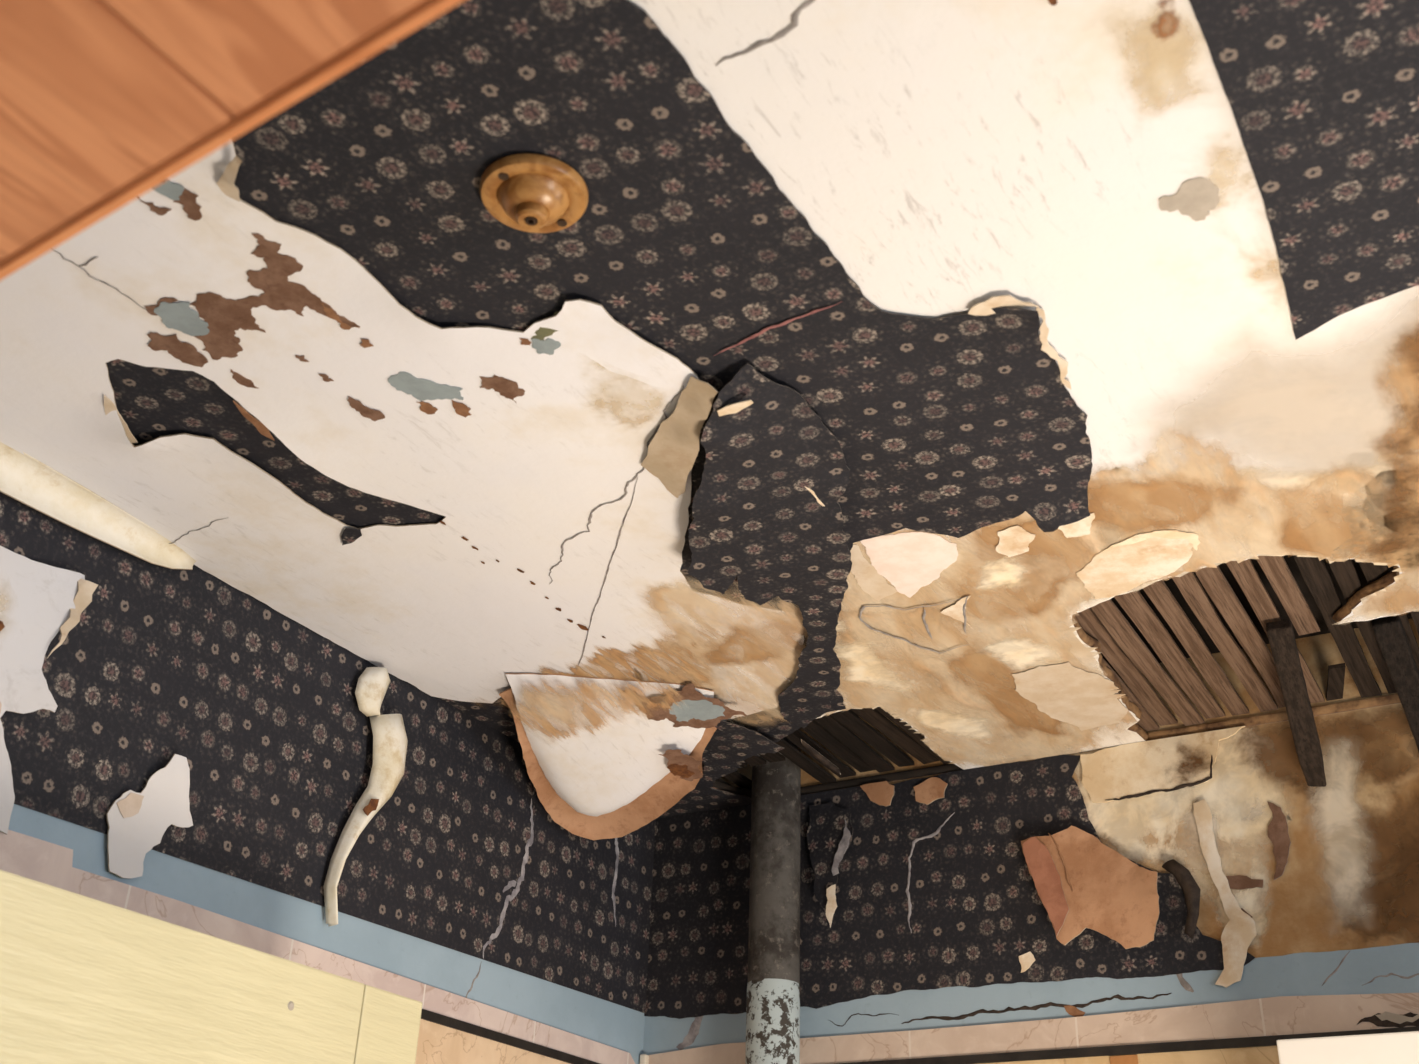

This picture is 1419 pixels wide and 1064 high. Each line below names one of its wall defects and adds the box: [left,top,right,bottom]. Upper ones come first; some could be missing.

crack [715,0,815,66]
crack [52,249,153,315]
peeling [145,233,374,389]
peeling [388,372,471,417]
peeling [479,375,525,402]
crack [549,386,684,666]
peeling [850,532,958,601]
peeling [1076,530,1200,599]
damp [827,301,1419,944]
peeling [323,667,408,927]
crack [465,961,482,998]
crack [829,974,1194,1027]